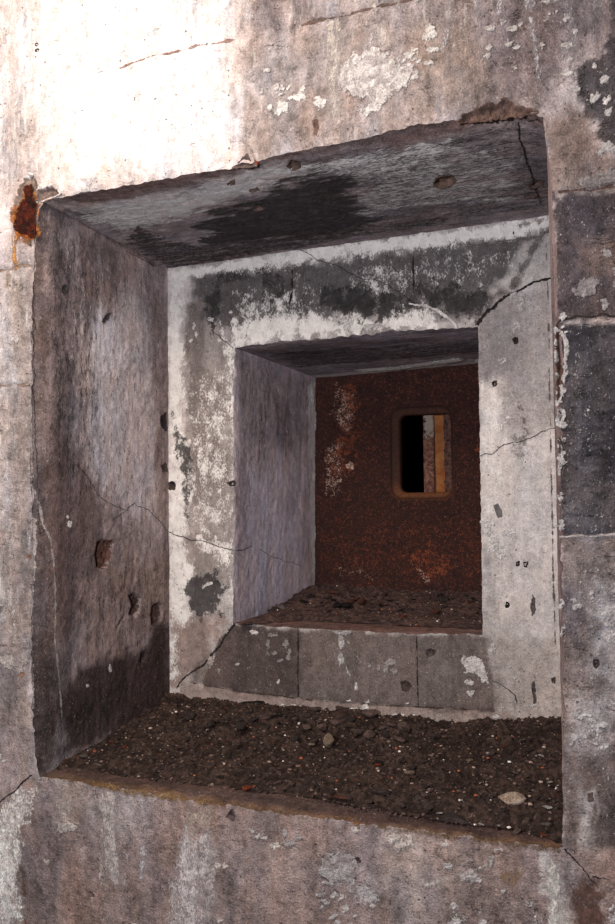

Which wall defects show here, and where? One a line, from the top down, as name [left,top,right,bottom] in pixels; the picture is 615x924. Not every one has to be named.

crack [517,119,541,206]
corrosion [5,184,41,287]
water stain [509,219,549,290]
water stain [409,303,458,329]
crack [476,277,551,326]
crack [76,464,300,566]
crack [176,623,236,688]
crack [0,774,32,802]